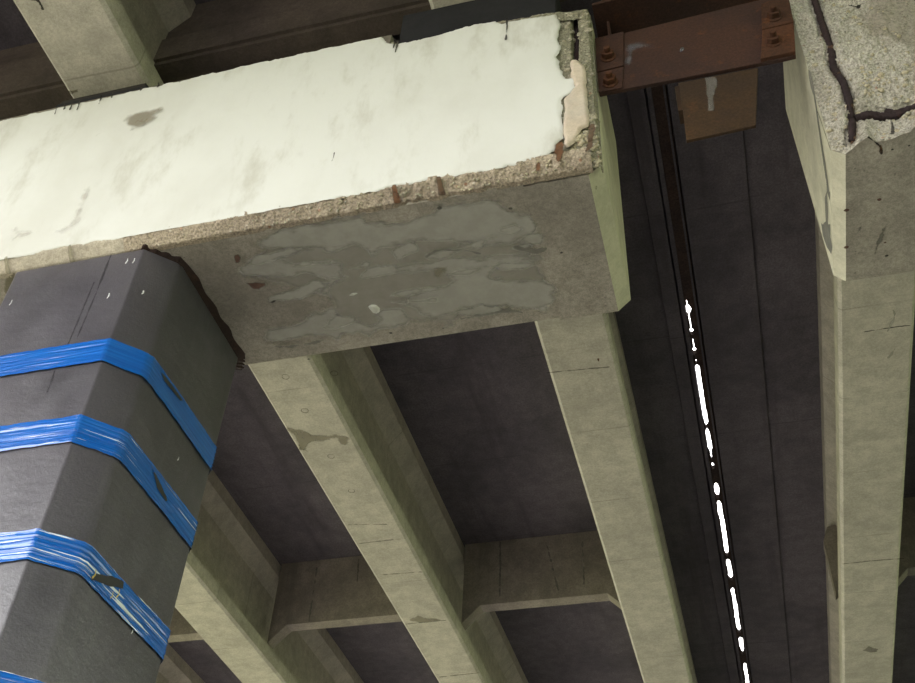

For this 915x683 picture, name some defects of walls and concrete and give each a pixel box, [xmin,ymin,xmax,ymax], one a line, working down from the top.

spalling [789,0,915,154]
leakage [128,108,160,126]
corrosion [585,124,595,152]
spalling [123,9,604,341]
corrosion [392,185,400,204]
corrosion [436,176,446,196]
leakage [288,428,348,450]